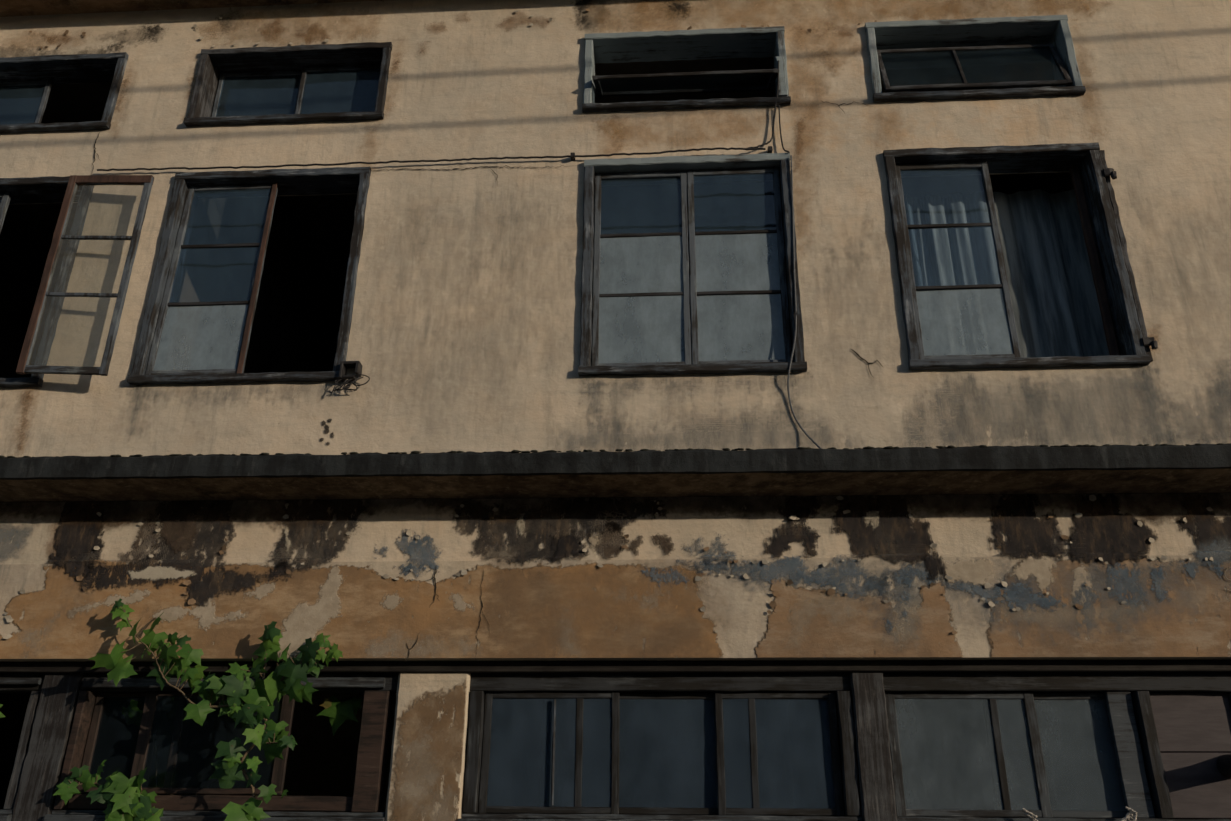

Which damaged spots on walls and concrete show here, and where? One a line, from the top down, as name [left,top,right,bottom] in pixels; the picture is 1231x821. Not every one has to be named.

leakage [576,0,605,27]
crack [475,571,490,659]
peeling [0,493,1231,659]
peeling [390,680,467,821]